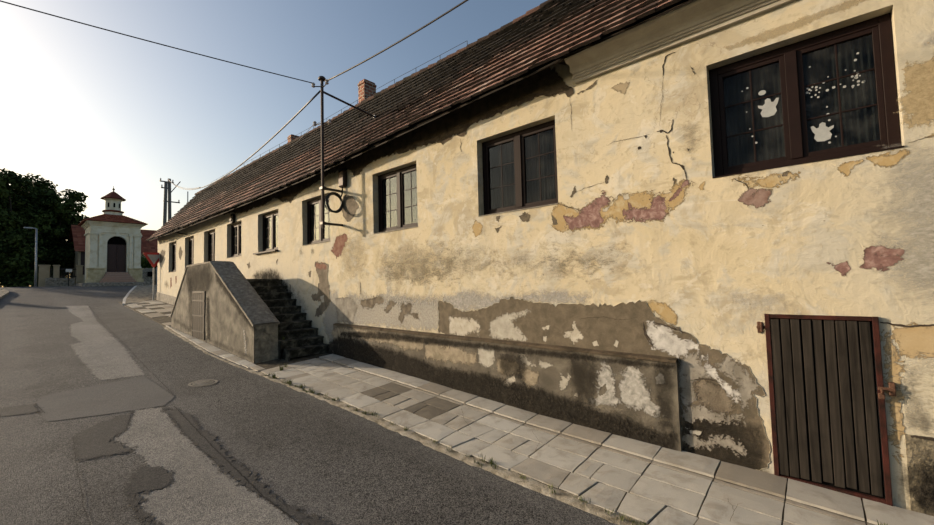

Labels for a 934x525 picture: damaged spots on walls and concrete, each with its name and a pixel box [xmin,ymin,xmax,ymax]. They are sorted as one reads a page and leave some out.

peeling [340,194,359,222]
spalling [223,66,599,216]
peeling [612,82,630,95]
peeling [551,175,705,233]
crack [615,52,690,181]
peeling [731,171,800,208]
peeling [826,245,905,276]
peeling [837,57,934,176]
spalling [308,234,771,471]
damp [324,290,762,471]
peeling [880,320,934,464]
damp [900,459,934,513]